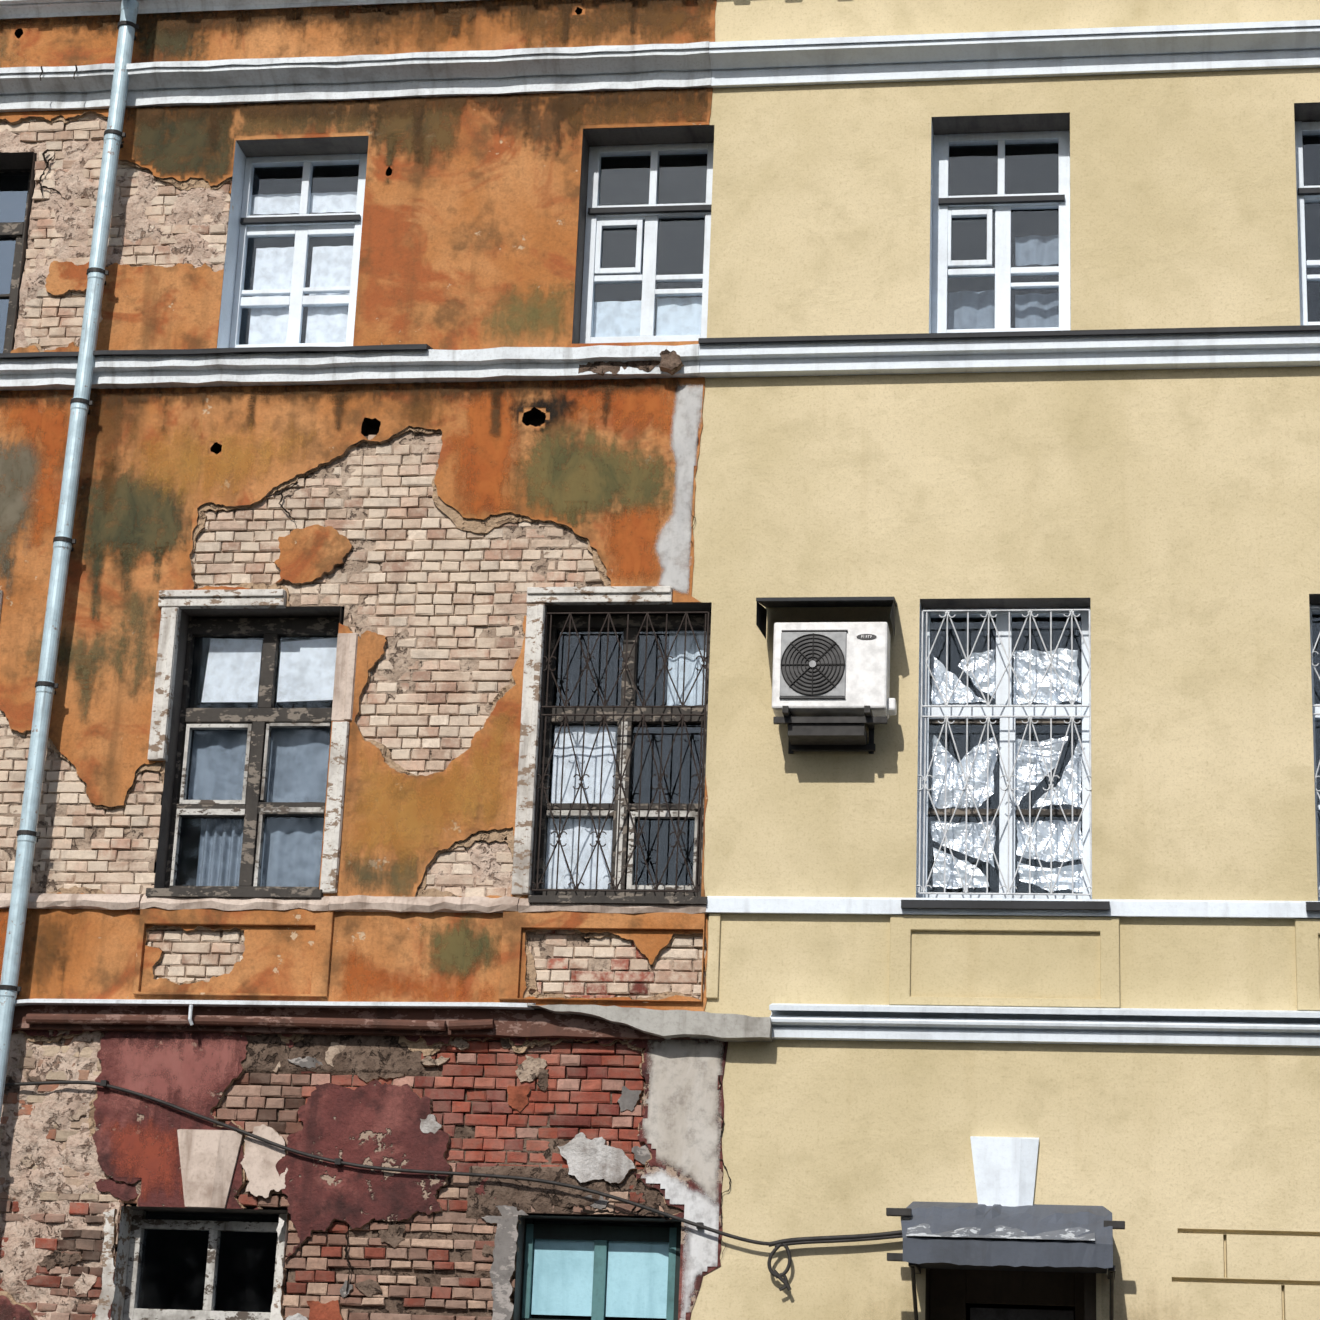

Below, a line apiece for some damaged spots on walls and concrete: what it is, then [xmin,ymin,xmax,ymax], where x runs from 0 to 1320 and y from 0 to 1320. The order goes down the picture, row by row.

flaking render [0,111,233,352]
leakage [57,551,154,715]
flaking render [189,349,703,776]
flaking render [0,710,31,893]
flaking render [29,737,166,895]
flaking render [415,827,514,897]
flaking render [145,925,245,985]
flaking render [523,929,707,1011]
flaking render [0,1031,722,1320]